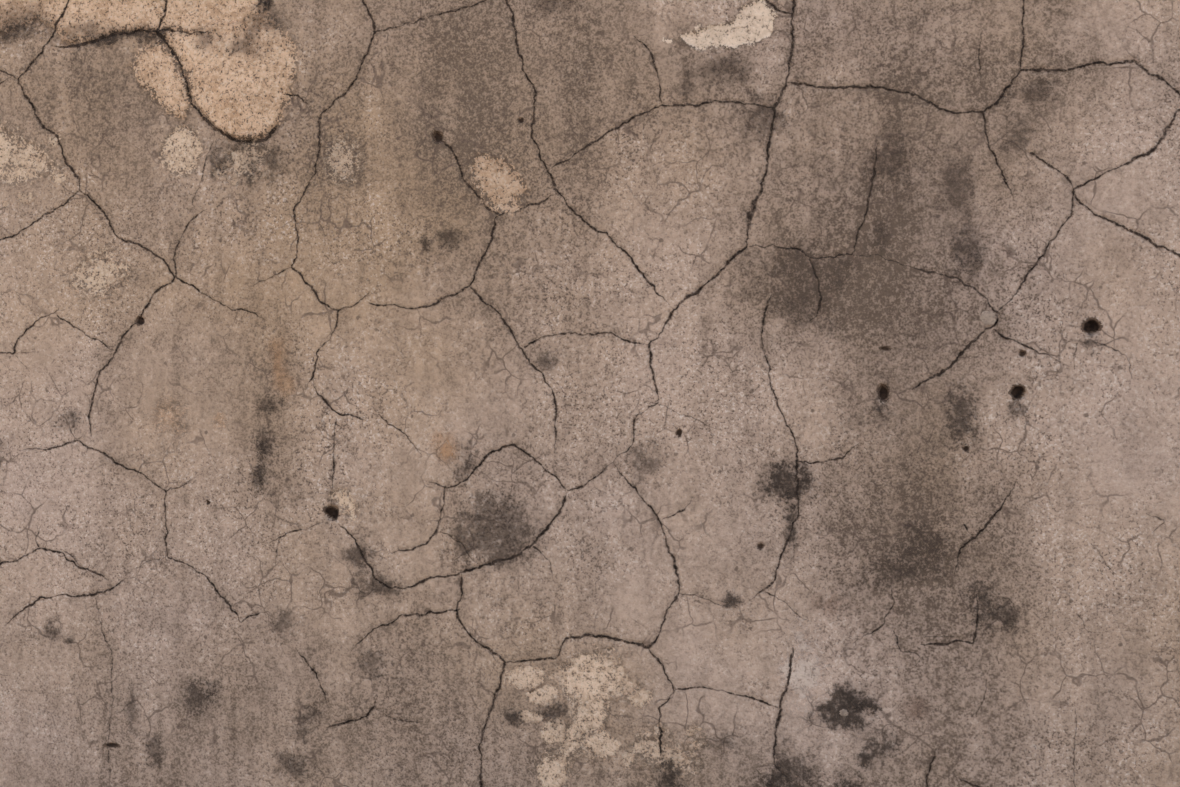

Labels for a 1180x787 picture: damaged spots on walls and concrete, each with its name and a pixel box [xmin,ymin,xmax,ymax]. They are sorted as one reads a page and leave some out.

peeling [662,0,778,51]
peeling [0,0,272,185]
peeling [470,153,527,214]
crack [0,0,277,622]
crack [264,0,1180,787]
leakage [758,461,815,542]
leakage [722,594,741,608]
crack [0,532,121,772]
peeling [505,648,701,787]
leakage [782,637,819,702]
leakage [809,681,877,731]
leakage [766,757,816,787]